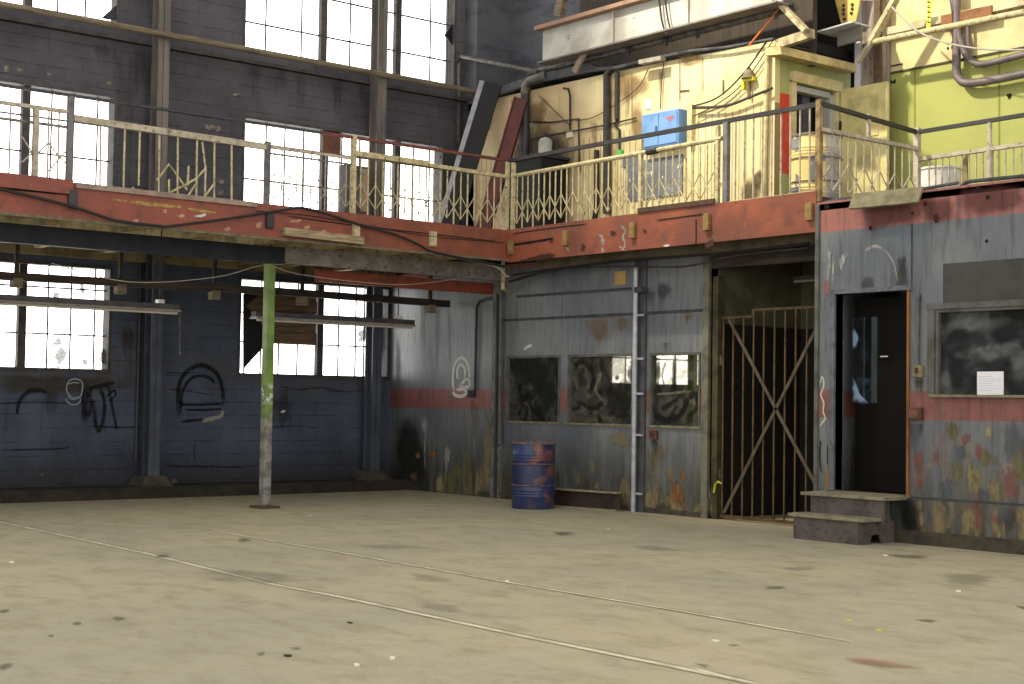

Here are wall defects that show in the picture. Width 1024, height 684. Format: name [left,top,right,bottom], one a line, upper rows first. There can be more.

peeling [914,500,946,533]
peeling [945,422,1024,540]